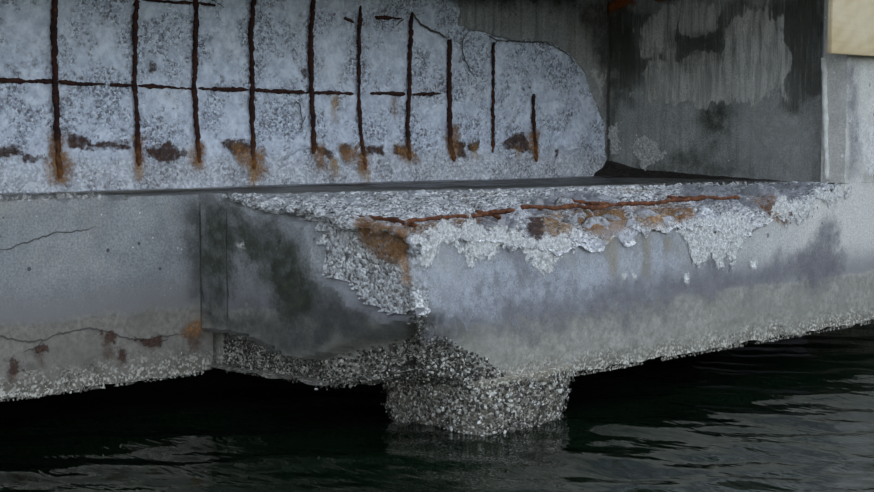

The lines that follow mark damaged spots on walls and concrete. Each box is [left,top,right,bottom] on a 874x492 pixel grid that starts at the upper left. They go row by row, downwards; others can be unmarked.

leakage [580,0,823,168]
corrosion [0,132,205,183]
corrosion [222,139,268,182]
corrosion [315,144,419,172]
spalling [0,0,839,317]
corrosion [446,125,480,157]
corrosion [503,132,540,157]
corrosion [526,205,693,241]
corrosion [355,217,436,284]
crack [0,208,281,355]
corrosion [100,330,127,361]
corrosion [134,335,162,347]